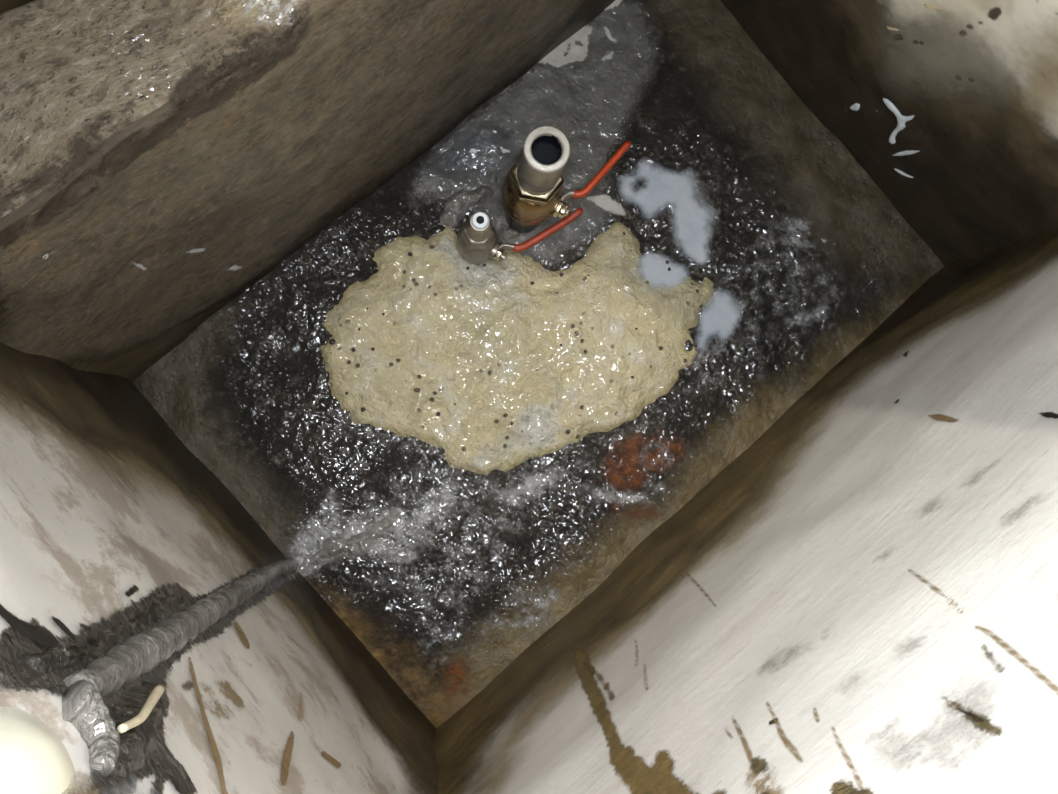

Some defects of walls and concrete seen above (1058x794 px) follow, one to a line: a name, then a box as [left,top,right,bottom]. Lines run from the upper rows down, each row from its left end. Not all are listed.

leakage [0,0,615,567]
corrosion [586,435,682,517]
leakage [275,0,1058,794]